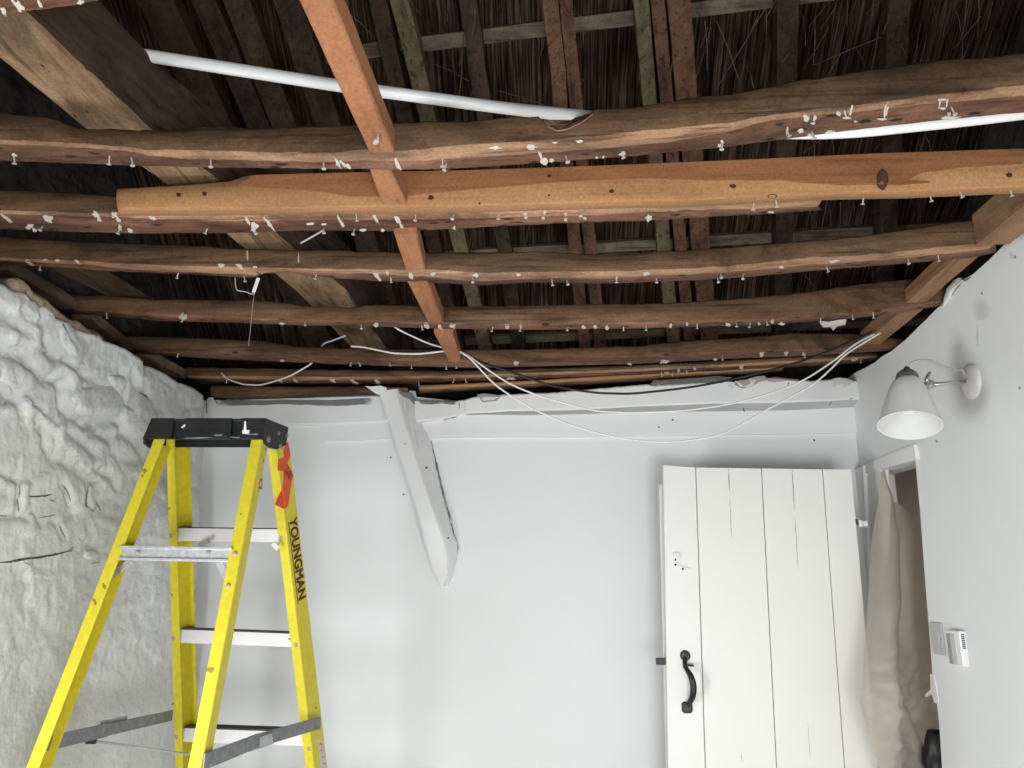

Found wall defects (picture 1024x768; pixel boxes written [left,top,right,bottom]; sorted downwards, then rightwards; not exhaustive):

crack [0,482,101,566]